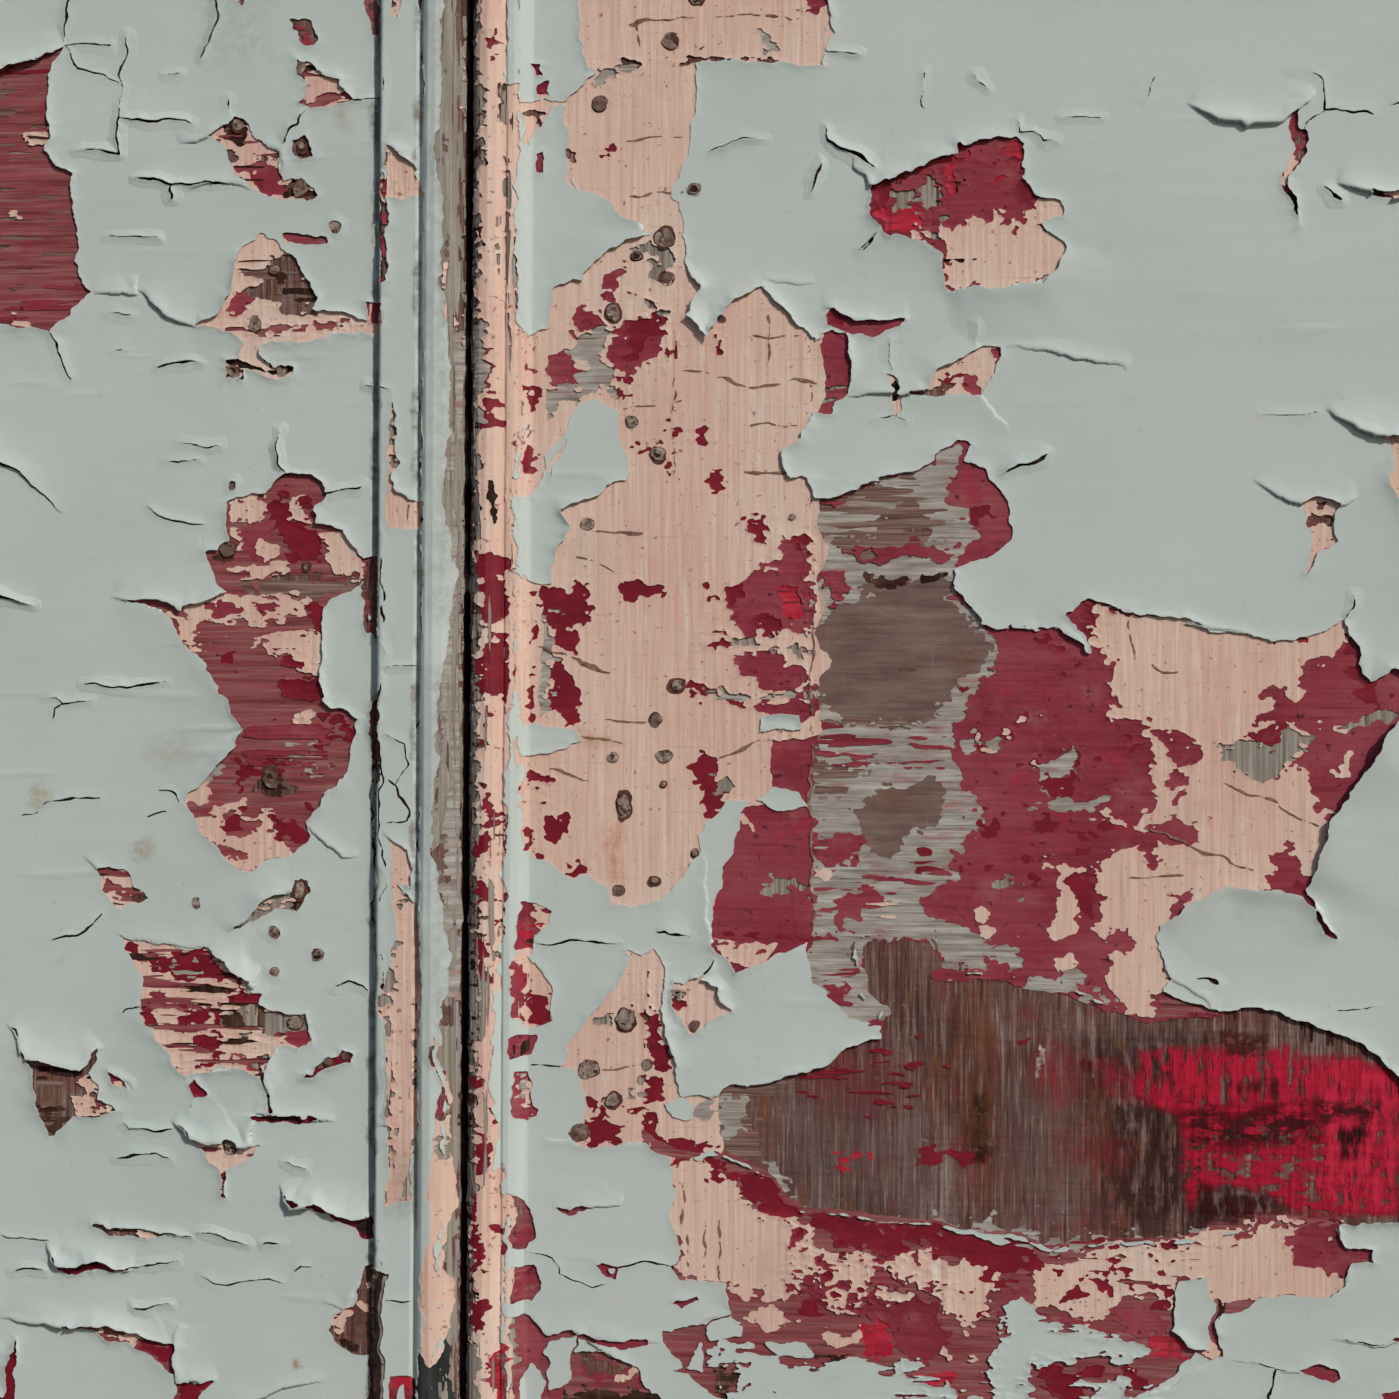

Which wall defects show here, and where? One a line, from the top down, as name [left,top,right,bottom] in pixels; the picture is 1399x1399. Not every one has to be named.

crack [59,0,227,200]
peeling [0,42,382,380]
crack [1324,186,1342,200]
peeling [12,473,381,1198]
peeling [281,0,1399,1399]